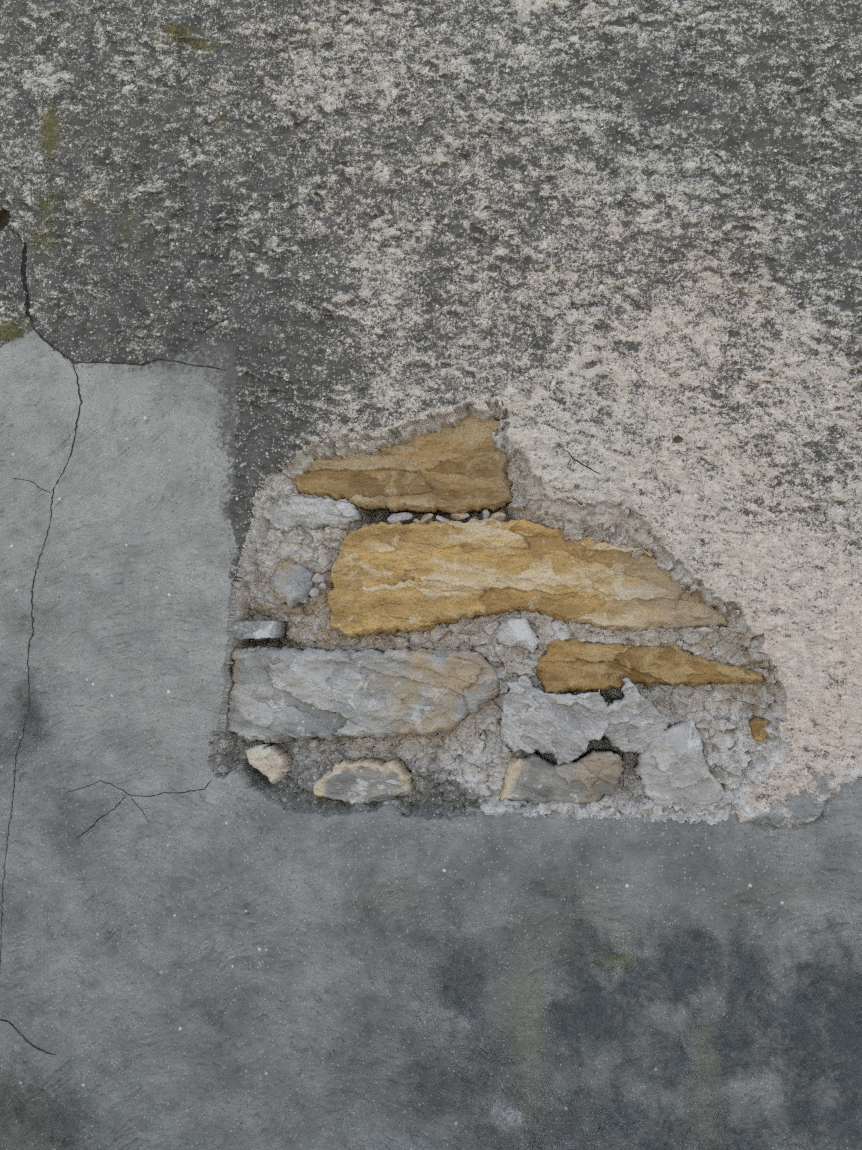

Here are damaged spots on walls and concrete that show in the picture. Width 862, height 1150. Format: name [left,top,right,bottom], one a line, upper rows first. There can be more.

crack [0,227,226,963]
spalling [208,399,862,828]
crack [0,1020,55,1055]
water stain [551,925,862,1150]